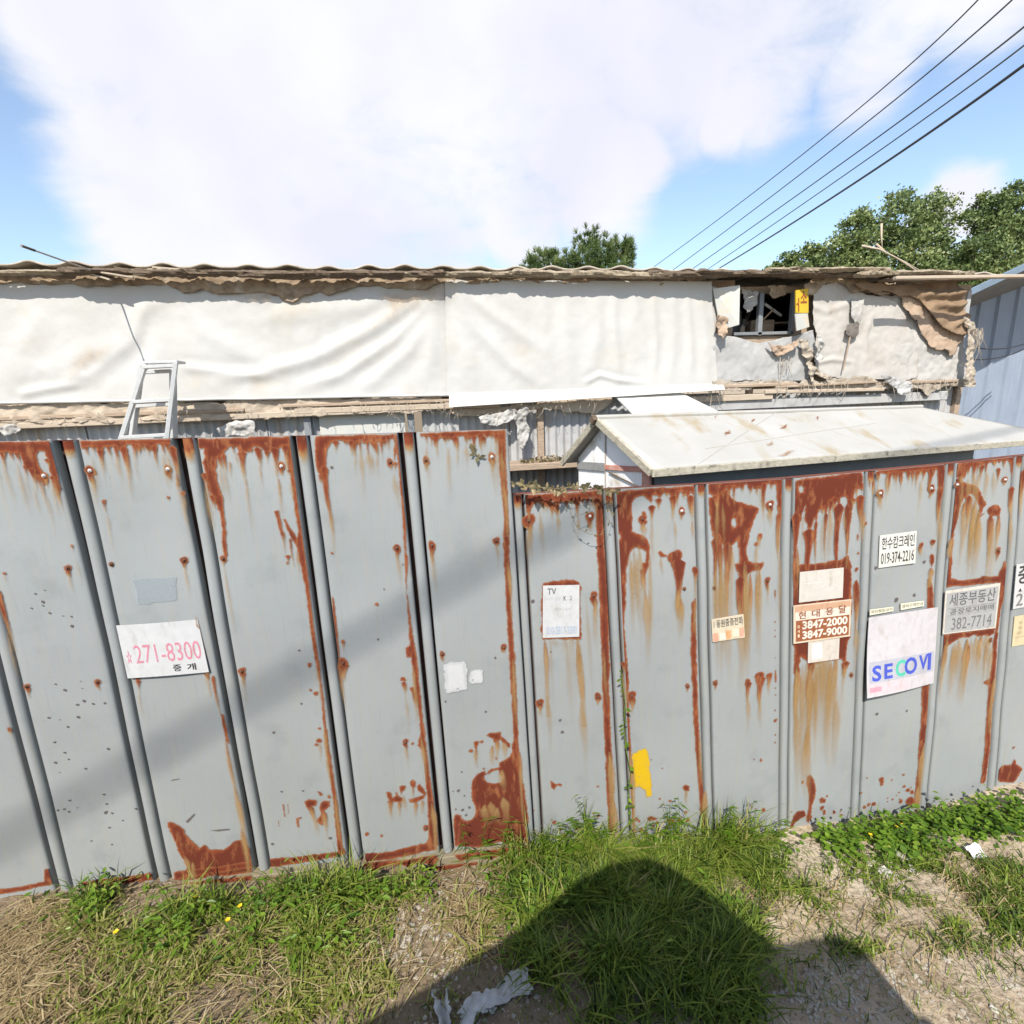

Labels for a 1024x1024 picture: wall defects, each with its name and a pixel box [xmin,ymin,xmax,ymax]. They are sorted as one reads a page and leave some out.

corrosion [0,869,52,894]
corrosion [0,430,1024,884]